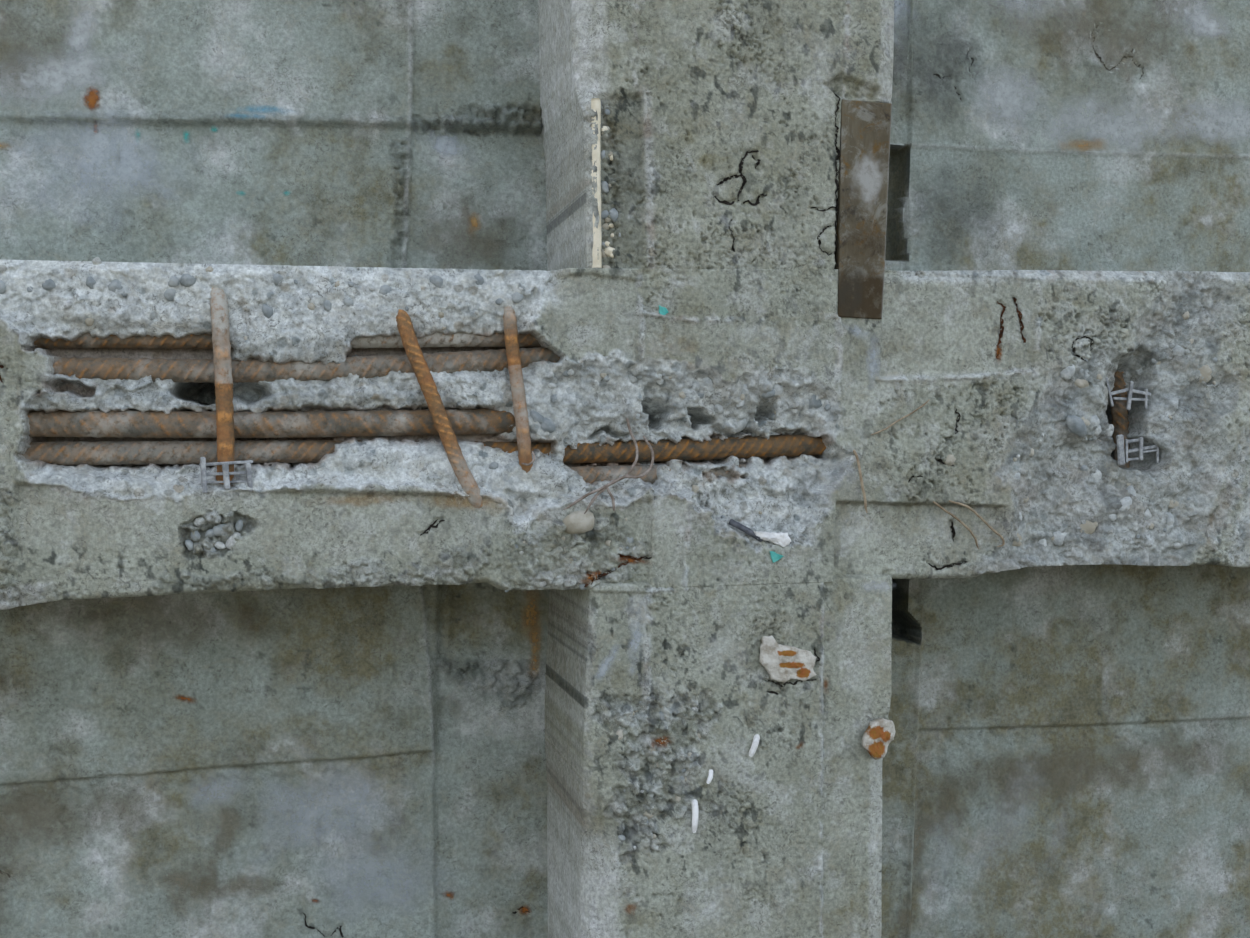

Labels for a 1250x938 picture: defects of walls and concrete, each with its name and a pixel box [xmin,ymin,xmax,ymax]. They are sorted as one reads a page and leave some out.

crack [1091,25,1144,79]
crack [714,150,767,252]
crack [811,93,840,269]
spalling [0,257,855,563]
spalling [972,271,1242,576]
crack [303,913,344,938]